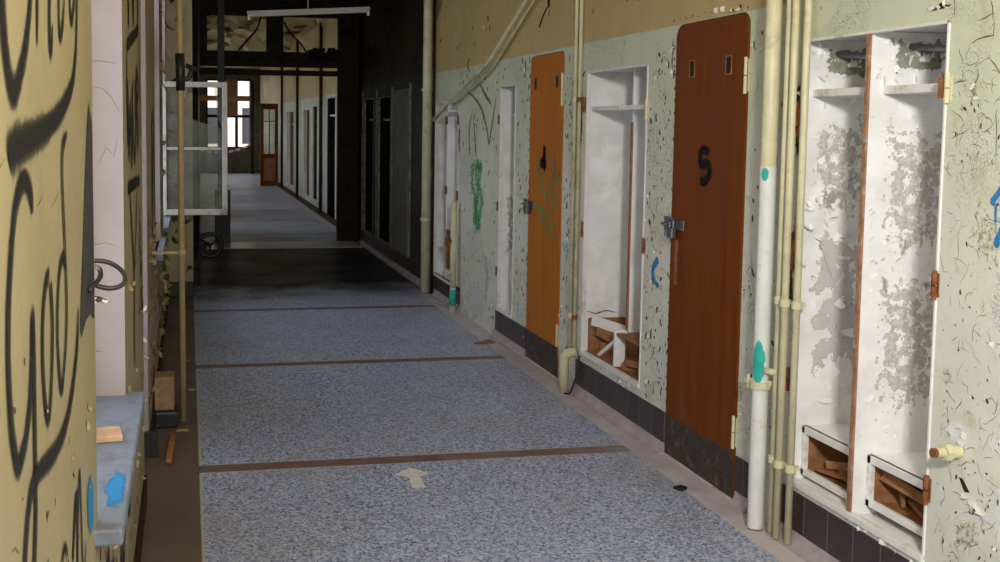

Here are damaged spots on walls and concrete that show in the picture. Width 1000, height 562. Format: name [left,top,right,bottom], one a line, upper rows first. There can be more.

peeling [457,144,529,338]
peeling [789,113,944,438]
crack [934,0,1000,560]
peeling [845,518,915,562]
peeling [943,371,1000,562]